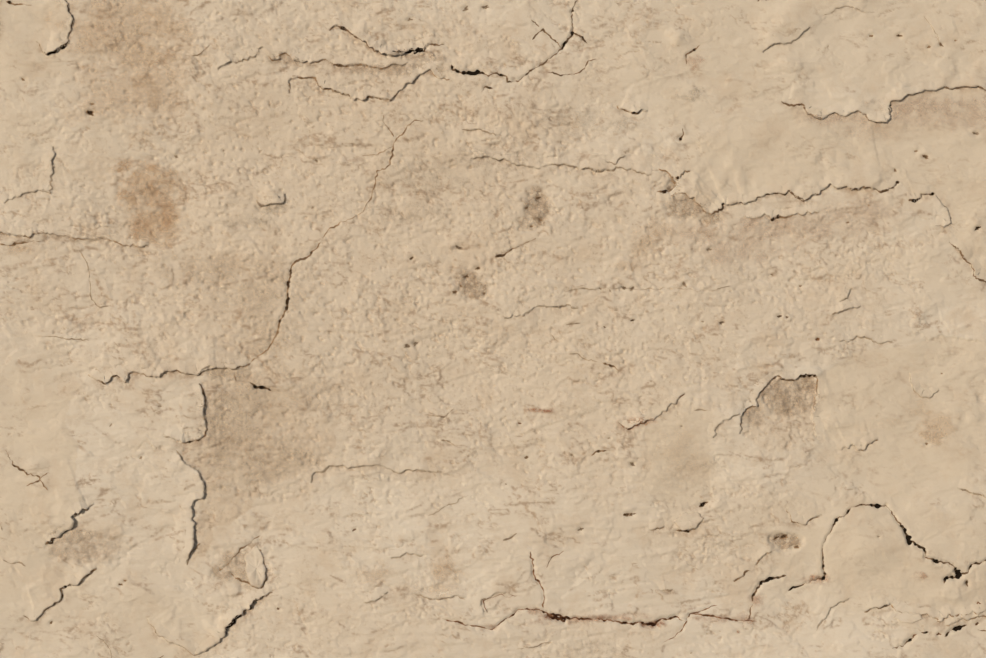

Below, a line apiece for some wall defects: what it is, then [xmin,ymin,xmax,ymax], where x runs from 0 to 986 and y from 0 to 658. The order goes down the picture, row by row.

peeling [36,0,74,55]
peeling [213,16,450,101]
crack [451,0,595,90]
peeling [781,77,986,123]
peeling [468,147,899,227]
crack [234,115,420,391]
peeling [694,366,826,438]
peeling [88,357,250,565]
peeling [40,498,94,545]
peeling [24,562,96,624]
peeling [147,536,273,656]
crack [446,504,986,649]